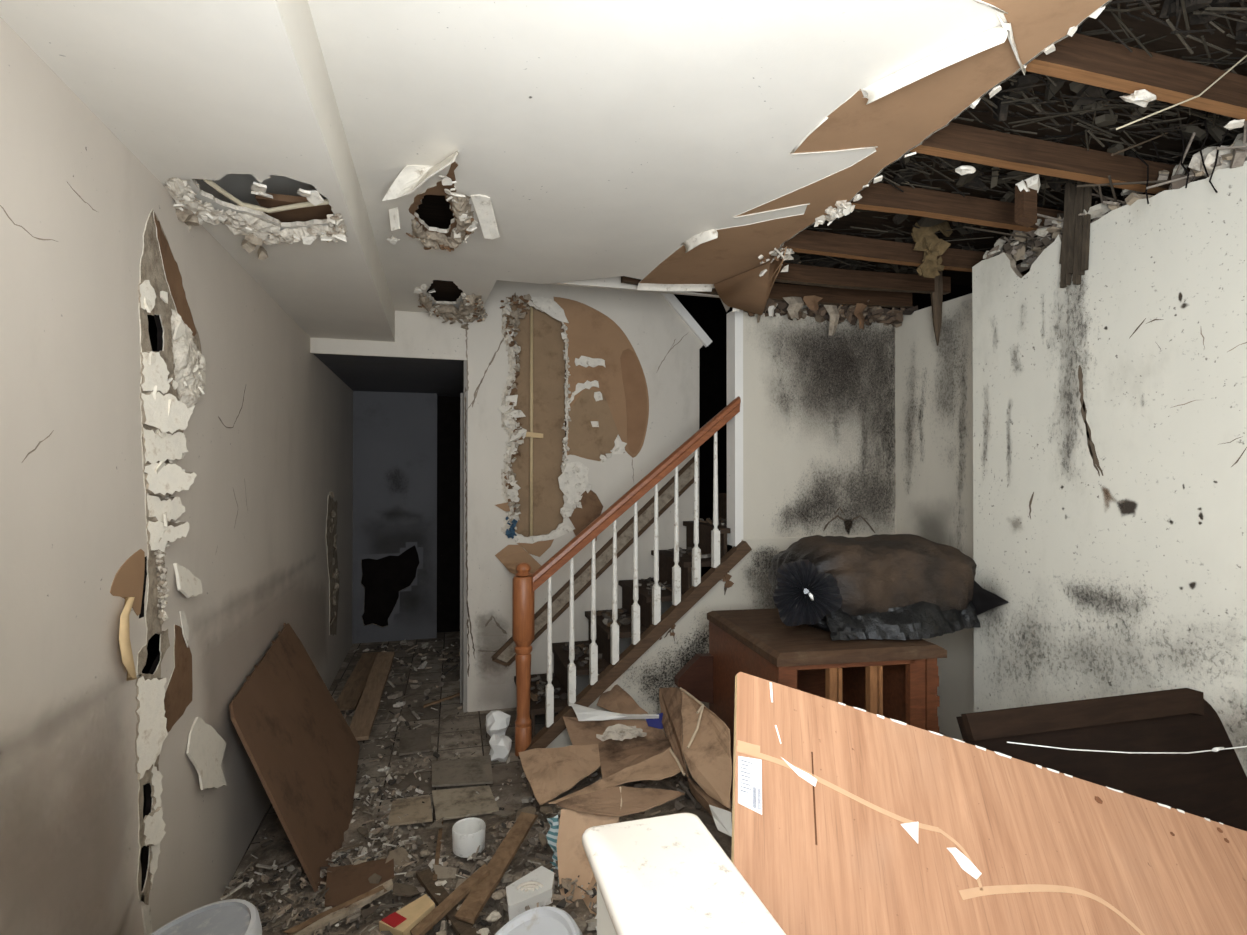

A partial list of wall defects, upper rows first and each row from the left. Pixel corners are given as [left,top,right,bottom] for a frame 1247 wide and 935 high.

spalling [163,177,348,260]
hole [382,151,500,252]
peeling [637,0,1112,292]
spalling [413,280,603,574]
leakage [781,327,923,534]
leakage [1042,280,1104,476]
flaking render [135,209,227,935]
flaking render [326,491,340,636]